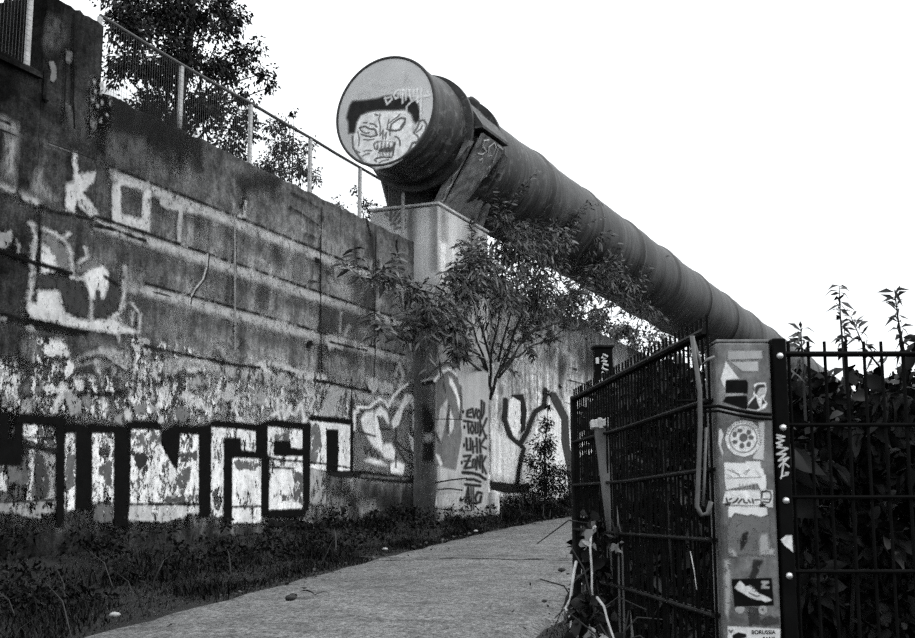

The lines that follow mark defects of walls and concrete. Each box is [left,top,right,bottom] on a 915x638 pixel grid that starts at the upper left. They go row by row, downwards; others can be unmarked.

spalling [0,183,404,322]
spalling [104,276,405,356]
peeling [0,312,414,523]